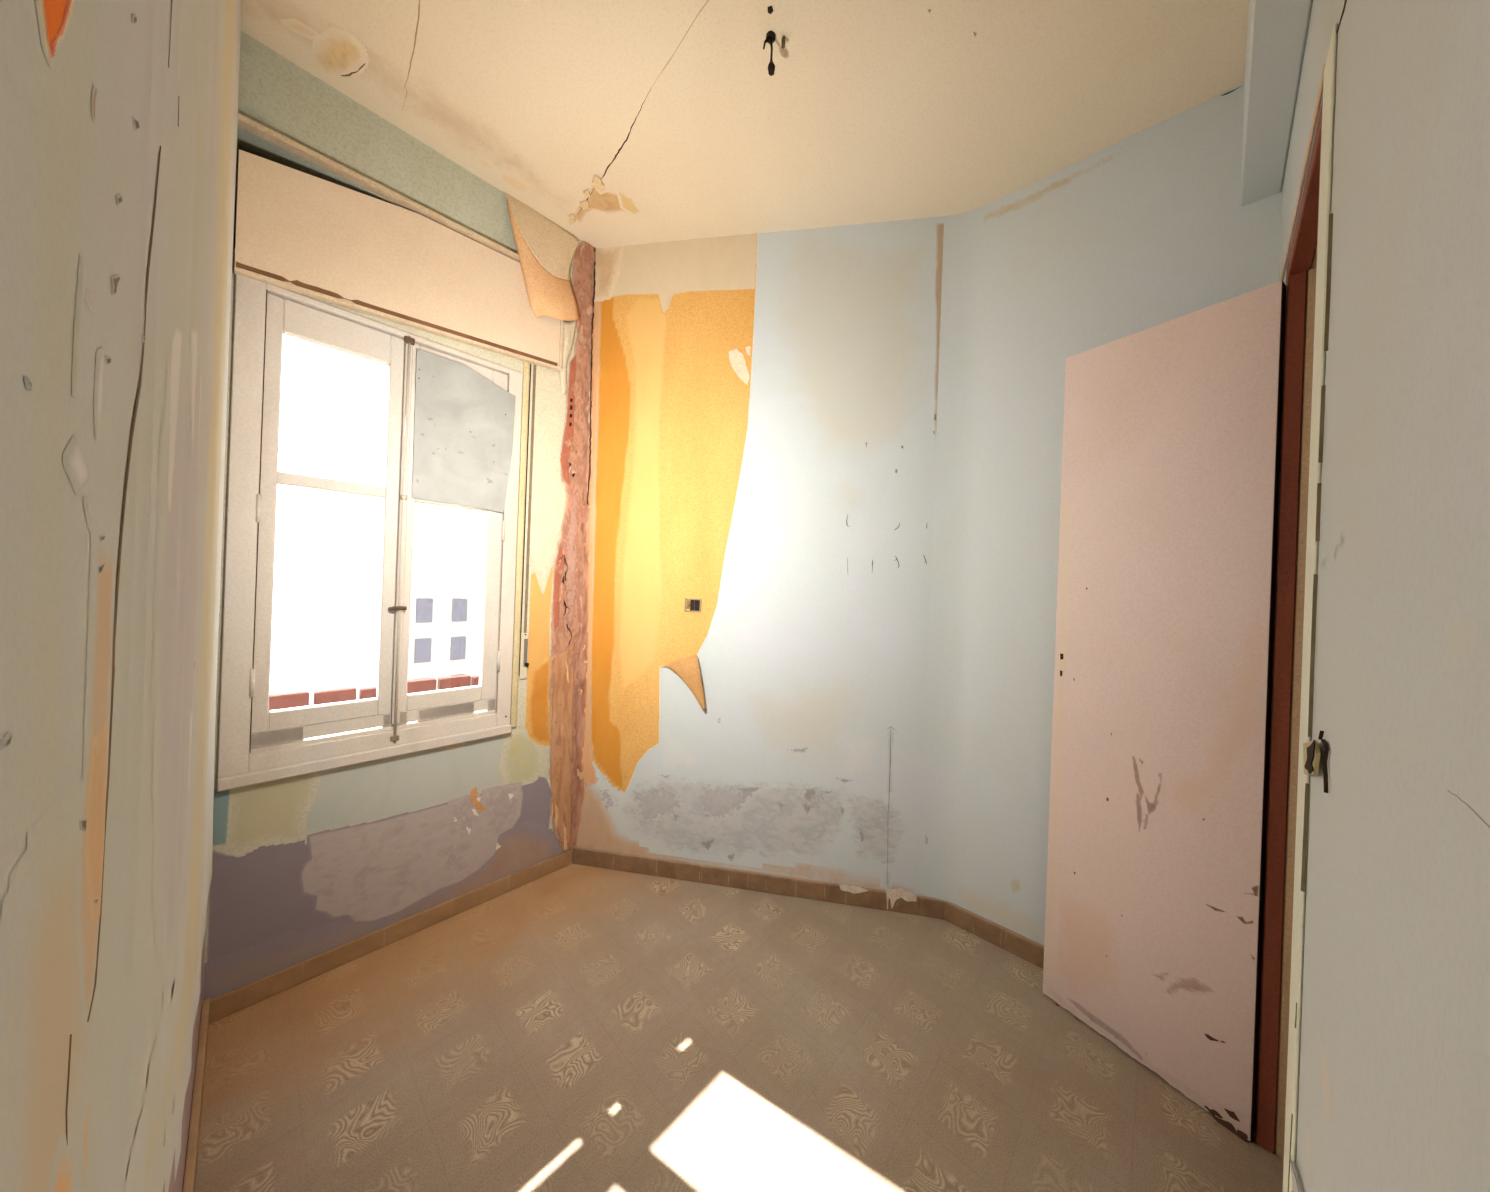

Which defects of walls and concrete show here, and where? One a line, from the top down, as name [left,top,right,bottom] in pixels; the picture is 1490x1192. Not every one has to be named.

peeling [530,173,758,851]